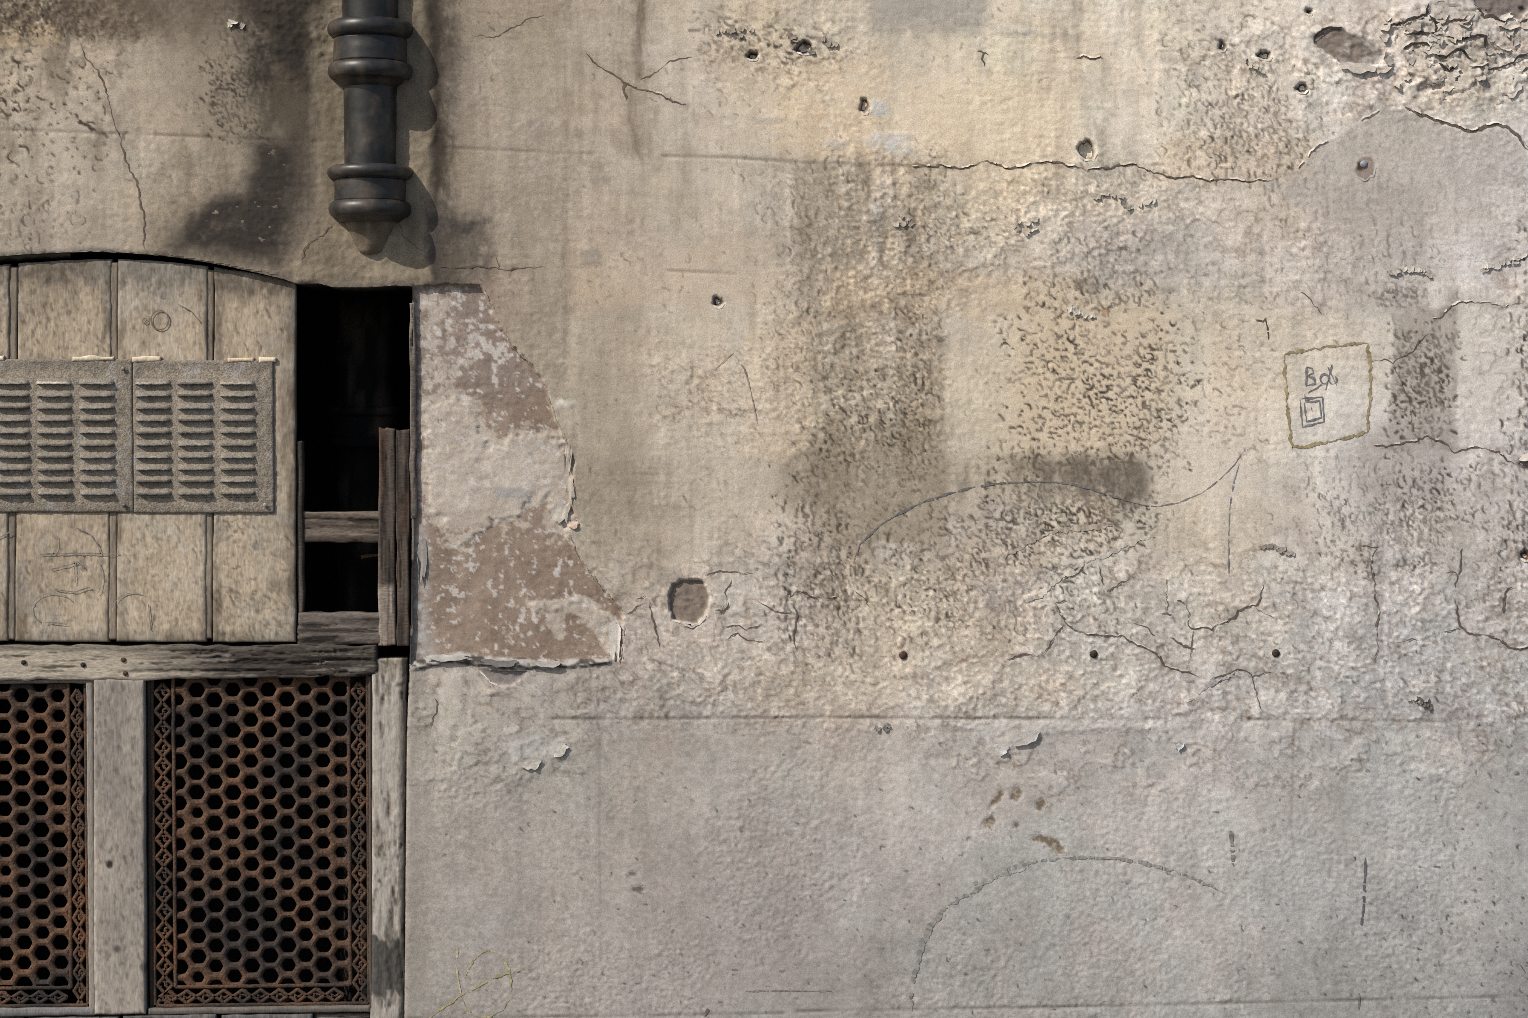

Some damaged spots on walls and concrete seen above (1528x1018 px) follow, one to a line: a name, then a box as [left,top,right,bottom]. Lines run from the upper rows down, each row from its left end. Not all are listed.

leakage [158,0,340,274]
leakage [419,0,487,289]
crack [586,53,688,105]
crack [1372,300,1523,466]
peeling [411,284,625,687]
spalling [668,578,711,632]
crack [1008,567,1274,710]
crack [1363,545,1528,661]